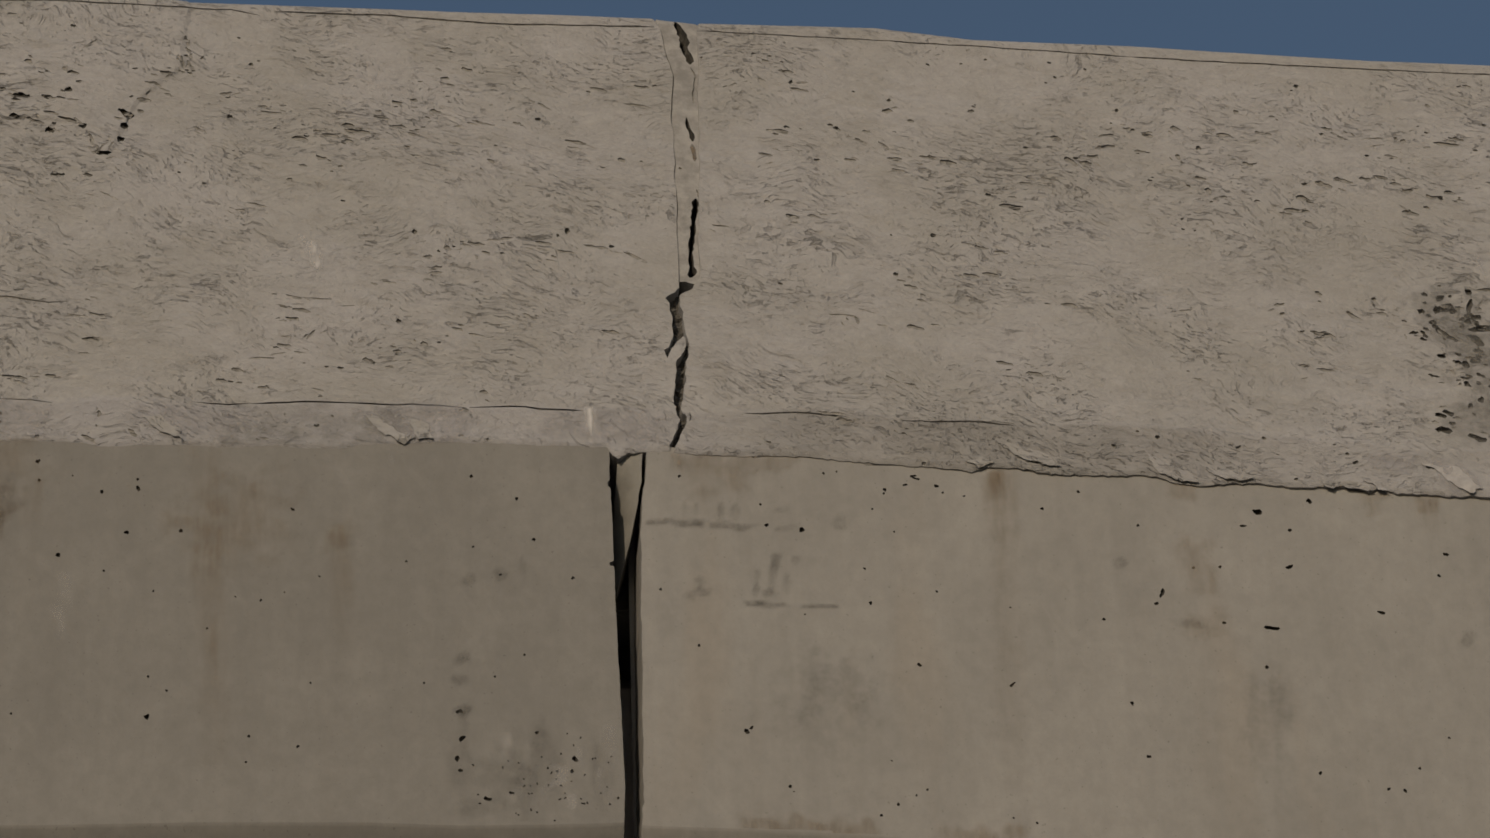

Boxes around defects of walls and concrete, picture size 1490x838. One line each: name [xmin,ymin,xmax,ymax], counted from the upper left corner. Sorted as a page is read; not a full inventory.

crack [666,189,699,448]
spalling [1300,330,1336,341]
spalling [996,361,1064,380]
spalling [1346,285,1490,442]
peeling [365,407,469,444]
peeling [966,416,1061,468]
peeling [1136,430,1255,482]
peeling [1323,444,1388,491]
peeling [1420,463,1481,493]